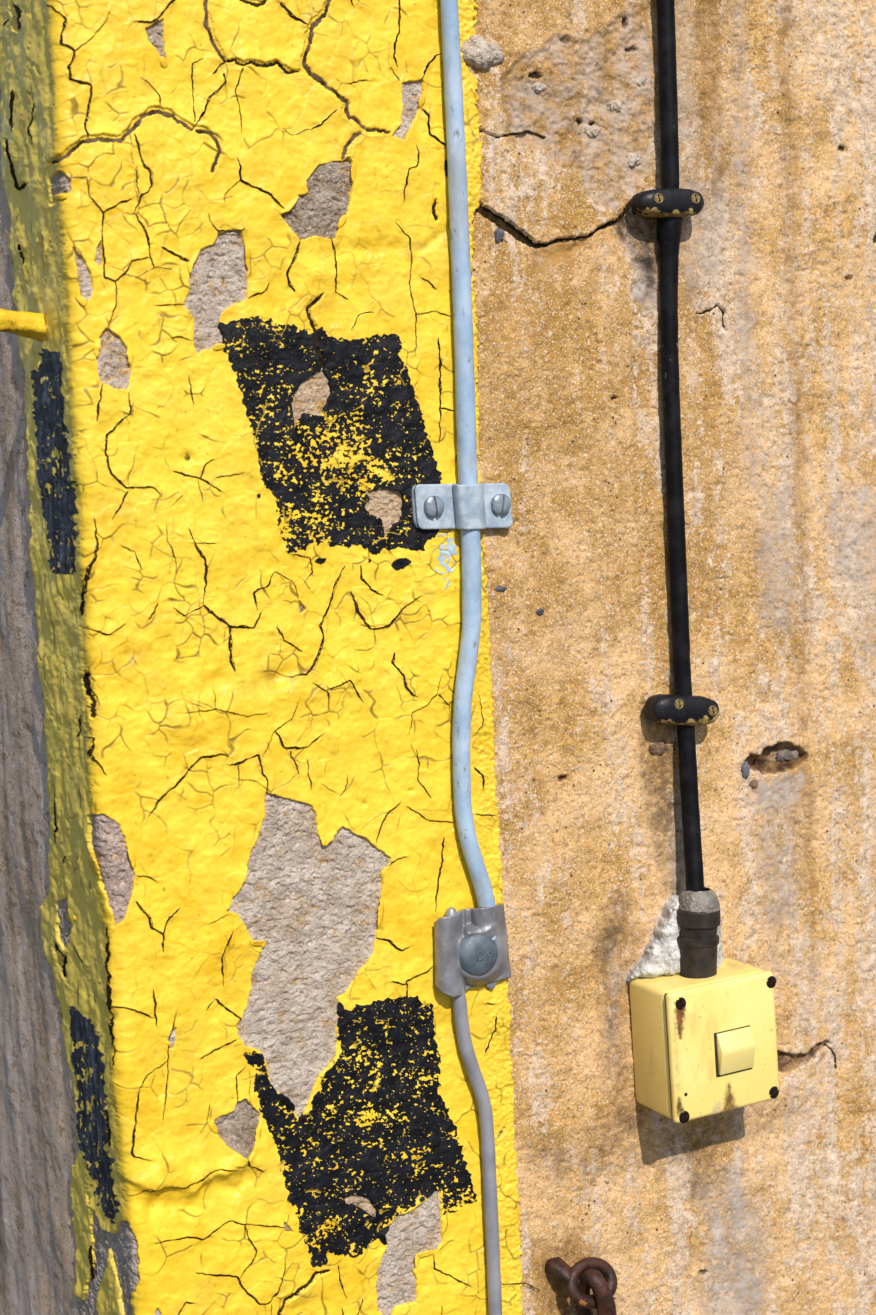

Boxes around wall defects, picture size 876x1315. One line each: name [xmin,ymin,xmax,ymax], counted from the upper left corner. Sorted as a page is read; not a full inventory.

crack [3,0,455,443]
peeling [279,159,356,240]
crack [475,202,631,248]
peeling [184,230,251,354]
crack [77,382,496,912]
spalling [740,742,805,807]
peeling [89,814,136,926]
crack [136,876,181,952]
peeling [227,792,390,1117]
crack [55,915,264,1192]
crack [155,1221,363,1315]
peeling [344,1190,442,1315]